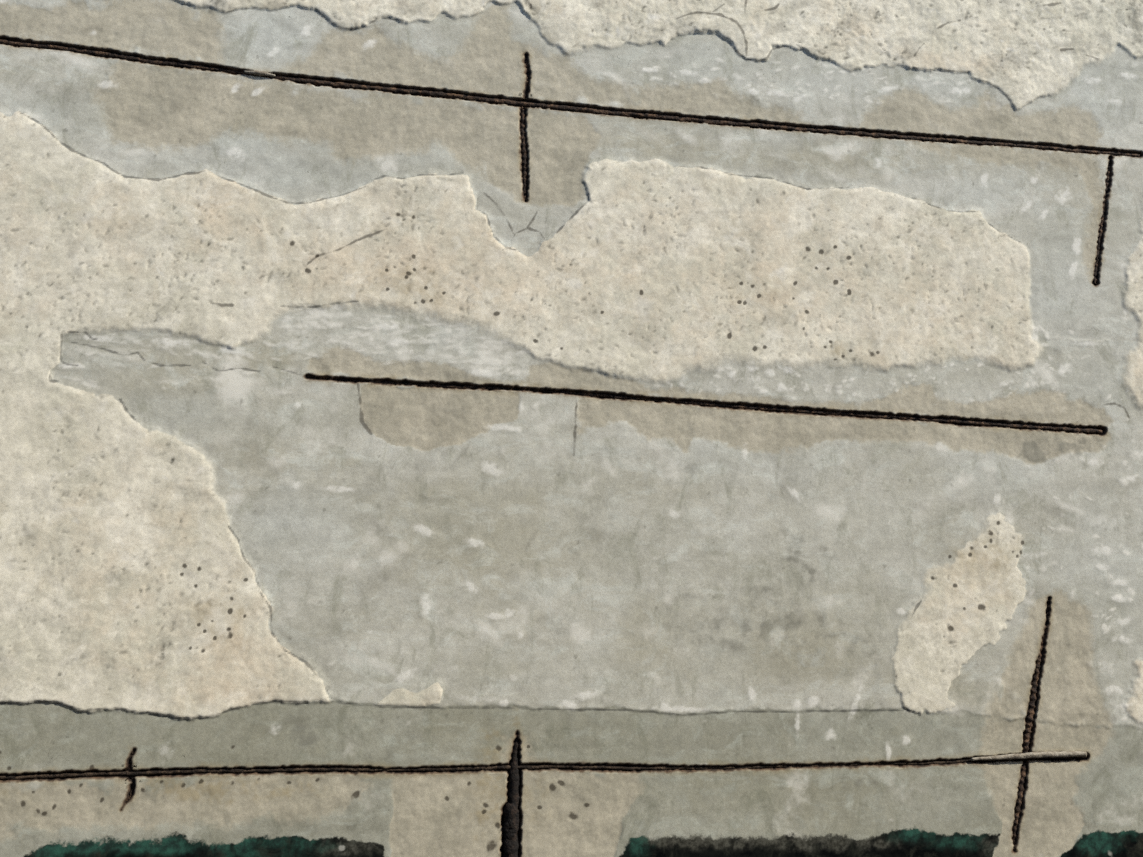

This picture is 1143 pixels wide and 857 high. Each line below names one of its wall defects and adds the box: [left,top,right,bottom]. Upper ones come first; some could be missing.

spalling [0,0,1143,347]
peeling [0,243,1143,857]